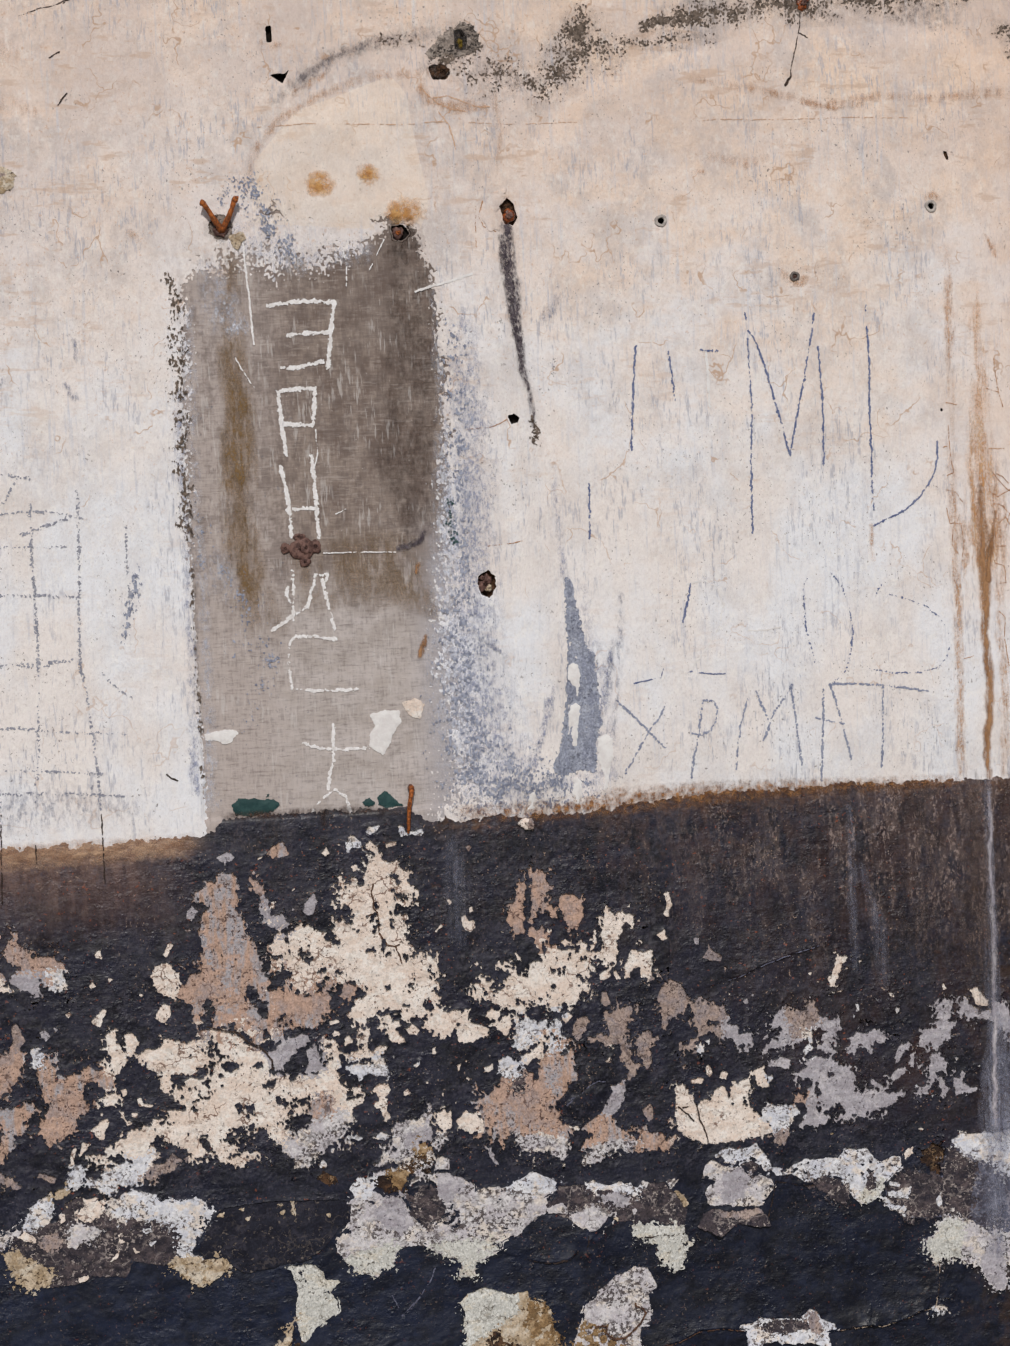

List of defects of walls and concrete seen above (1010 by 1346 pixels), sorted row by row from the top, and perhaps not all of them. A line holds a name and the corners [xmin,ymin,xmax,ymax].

rust [952,368,1007,779]
peeling [0,825,1010,1346]
damp [964,788,1010,1142]